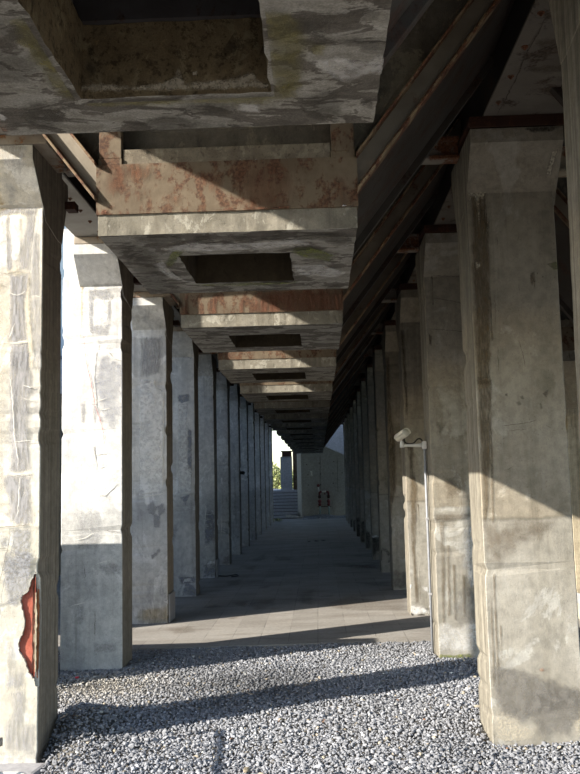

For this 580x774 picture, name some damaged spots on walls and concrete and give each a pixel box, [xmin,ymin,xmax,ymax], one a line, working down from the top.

rust [255,290,343,312]
leakage [470,192,494,519]
spalling [19,572,40,678]
leakage [493,634,580,739]